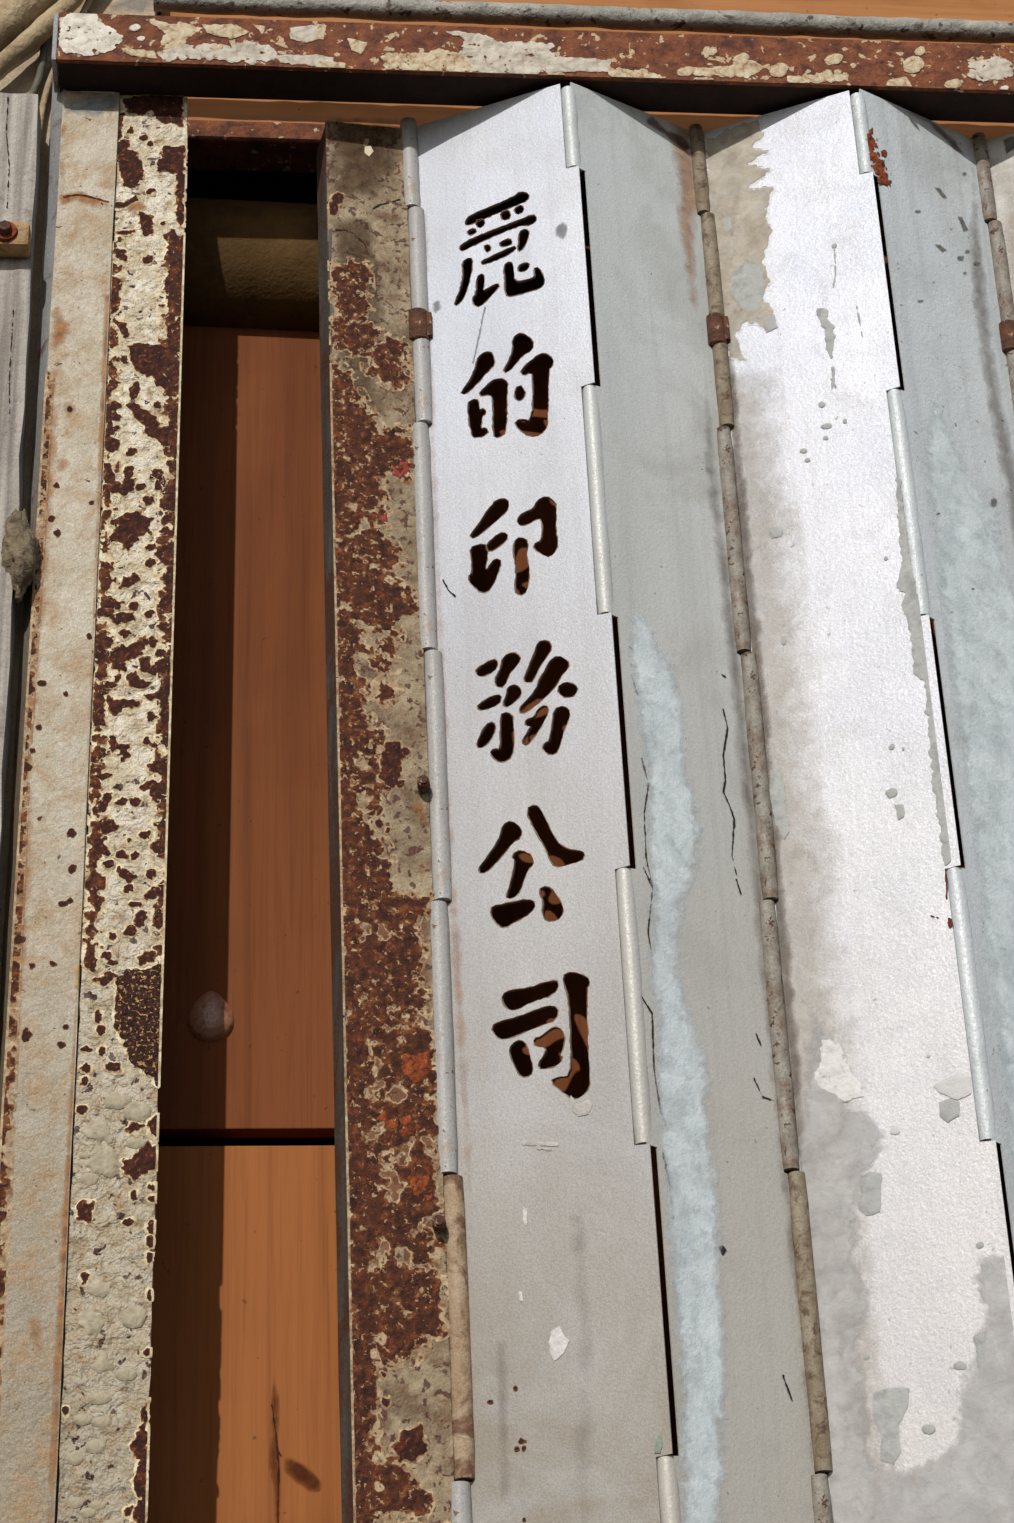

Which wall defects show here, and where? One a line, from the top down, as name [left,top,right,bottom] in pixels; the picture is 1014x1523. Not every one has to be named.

peeling [58,13,849,83]
peeling [886,46,926,86]
peeling [944,56,1014,90]
rust [867,128,892,186]
rust [55,95,188,1384]
rust [327,120,452,1523]
rust [56,1404,71,1419]
rust [121,1397,151,1523]